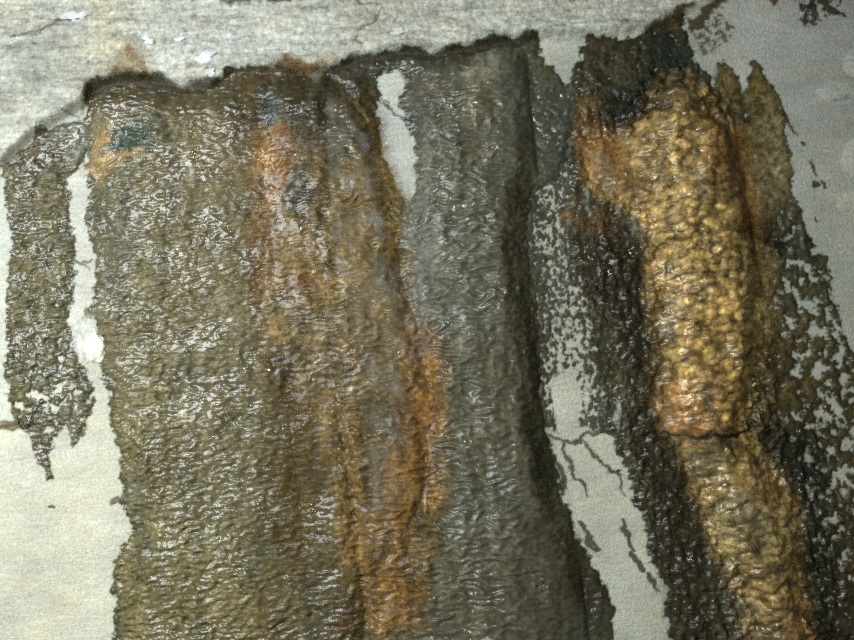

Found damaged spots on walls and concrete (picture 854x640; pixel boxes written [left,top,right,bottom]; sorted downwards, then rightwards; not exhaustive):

leakage [298,98,326,153]
leakage [261,208,306,241]
leakage [305,230,336,280]
corrosion [242,55,451,640]
corrosion [576,70,817,640]
crack [546,431,622,496]
crack [578,521,600,552]
crack [621,518,659,591]